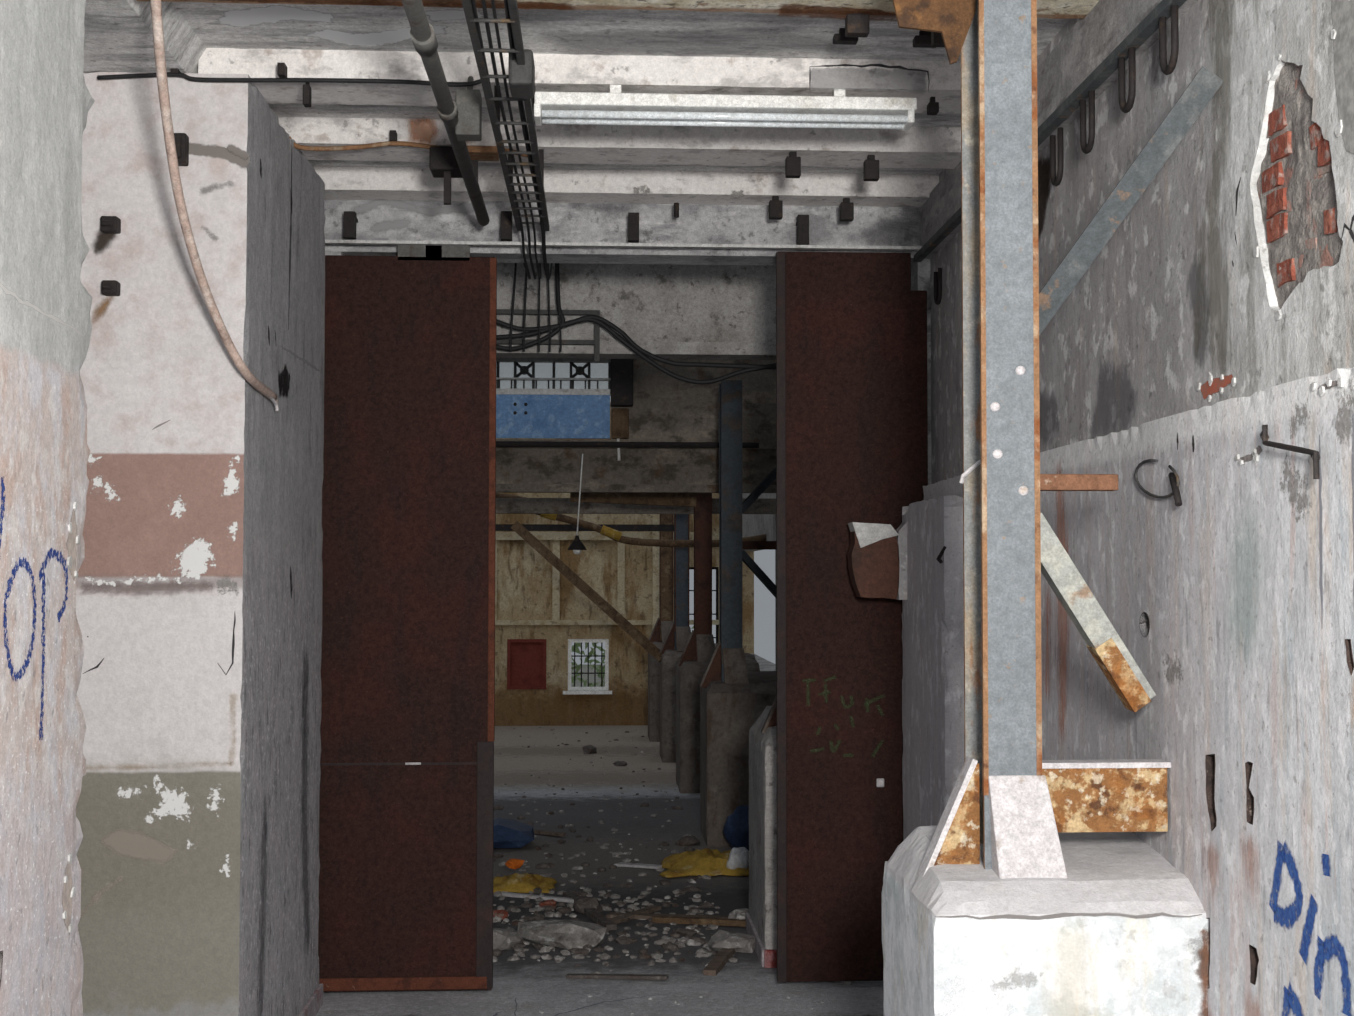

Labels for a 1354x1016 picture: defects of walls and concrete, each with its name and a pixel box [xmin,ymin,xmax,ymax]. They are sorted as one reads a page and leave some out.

spalling [1253,0,1354,321]
peeling [88,454,120,501]
peeling [221,455,240,496]
peeling [168,495,186,519]
peeling [67,502,238,594]